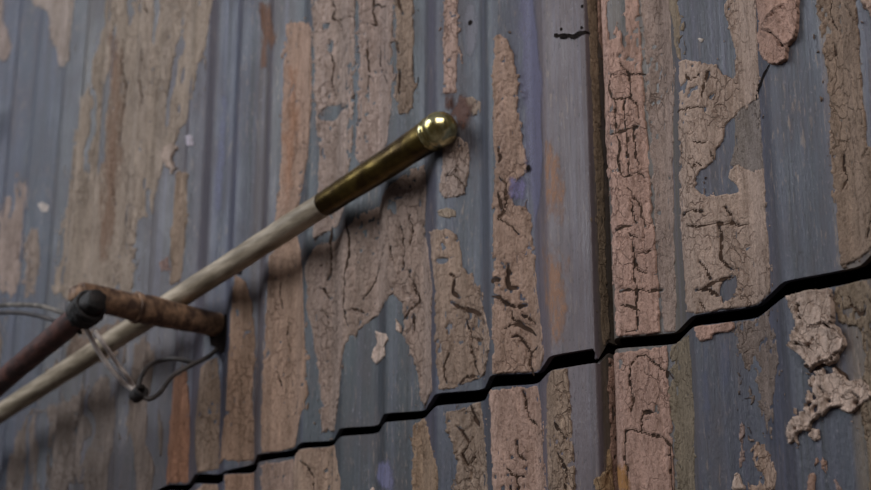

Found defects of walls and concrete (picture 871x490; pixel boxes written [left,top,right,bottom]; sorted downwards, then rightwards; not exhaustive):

peeling [45,316,124,372]
peeling [0,0,213,305]
peeling [99,0,576,490]
crack [162,63,871,490]
peeling [587,0,871,490]